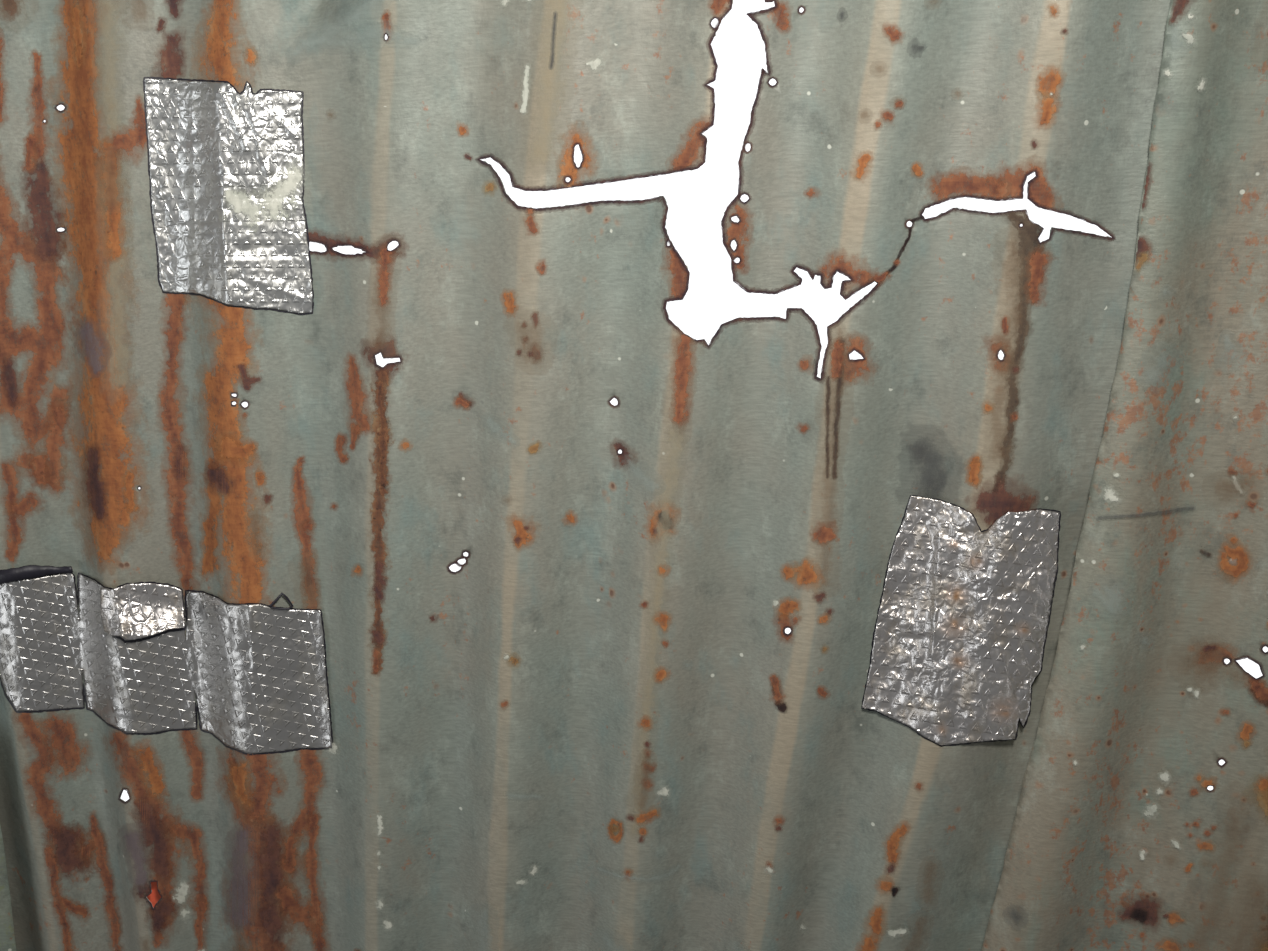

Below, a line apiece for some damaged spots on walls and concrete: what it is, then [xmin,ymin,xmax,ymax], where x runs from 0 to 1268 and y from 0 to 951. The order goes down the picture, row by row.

rust [157,0,256,86]
rust [0,0,147,565]
rust [159,294,272,604]
rust [293,457,319,609]
rust [613,443,632,466]
rust [673,334,693,424]
crack [738,163,1115,381]
rust [968,212,1052,525]
crack [1250,681,1268,706]
rust [18,713,121,951]
rust [110,730,208,951]
rust [223,750,327,951]